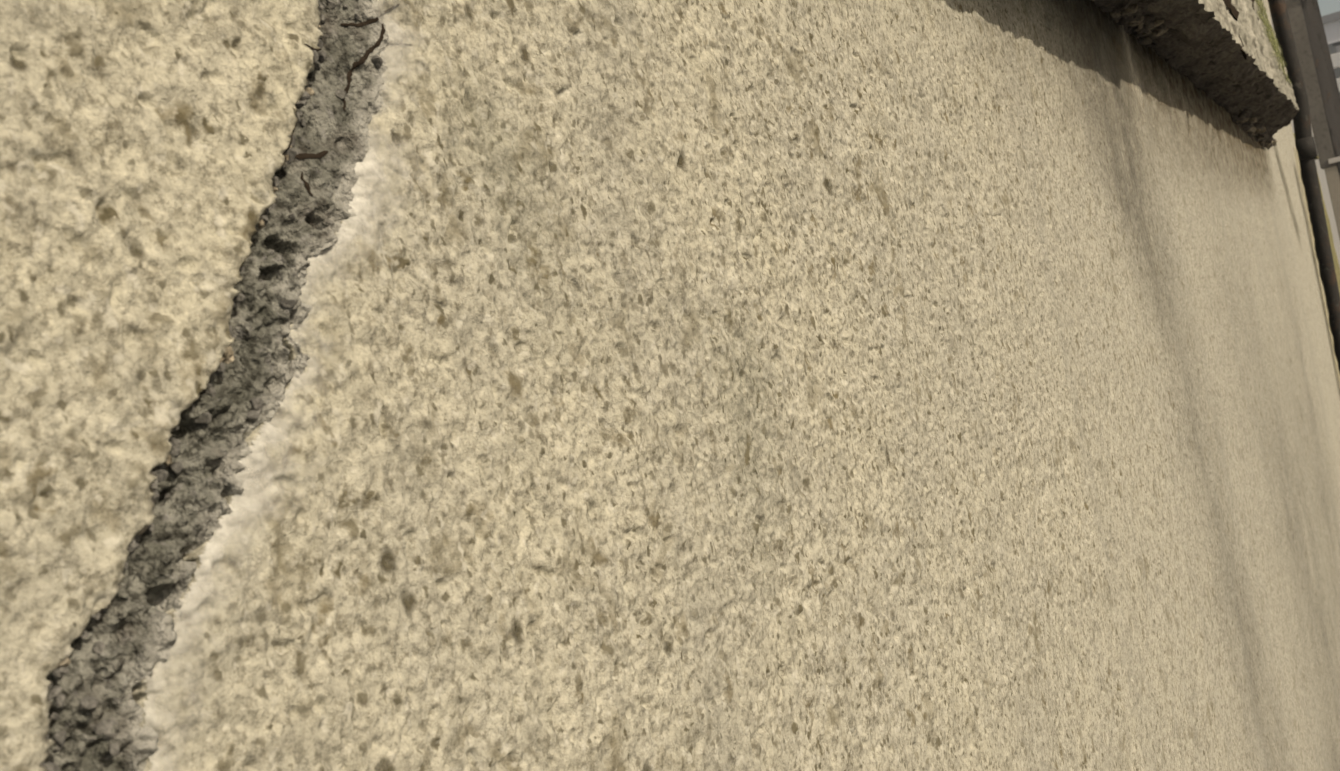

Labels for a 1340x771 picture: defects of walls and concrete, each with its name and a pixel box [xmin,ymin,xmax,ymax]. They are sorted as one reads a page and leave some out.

spalling [1231,109,1277,149]
water stain [308,138,383,269]
water stain [286,284,314,346]
crack [38,0,412,771]
water stain [278,358,315,406]
water stain [143,422,276,731]
water stain [149,748,161,771]